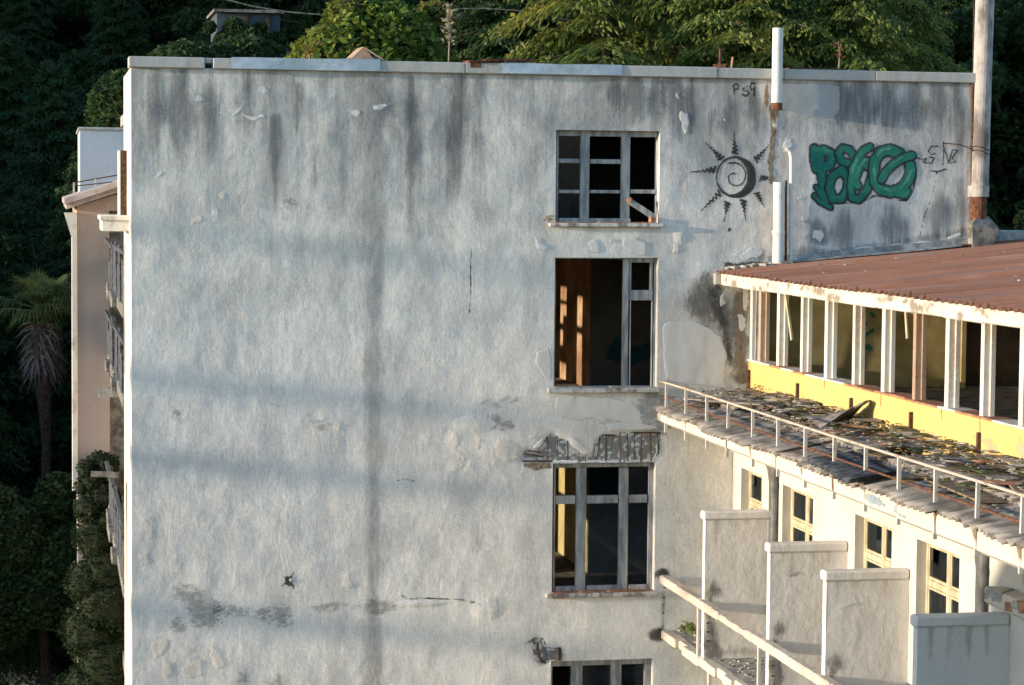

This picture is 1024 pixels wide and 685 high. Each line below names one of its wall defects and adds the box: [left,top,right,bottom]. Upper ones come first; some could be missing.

corrosion [765,85,778,184]
water stain [724,248,767,270]
water stain [689,274,749,384]
peeling [522,396,660,463]